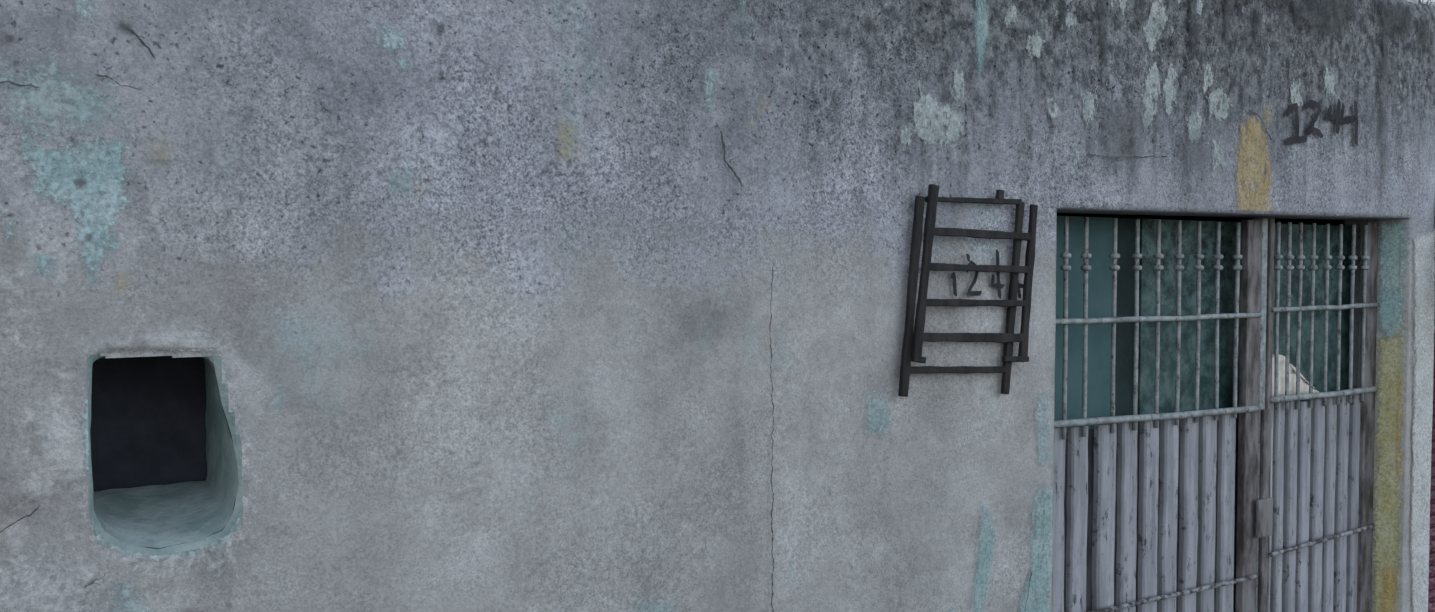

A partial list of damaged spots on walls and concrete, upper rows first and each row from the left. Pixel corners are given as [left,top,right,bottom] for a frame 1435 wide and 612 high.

peeling [976,0,988,70]
peeling [1026,29,1045,58]
water stain [1224,0,1358,51]
peeling [897,70,965,149]
peeling [1081,90,1098,125]
peeling [1141,0,1232,171]
peeling [1290,79,1303,107]
peeling [1324,67,1335,97]
peeling [0,61,131,282]
crack [720,131,743,187]
crack [768,263,776,612]
peeling [0,497,254,612]